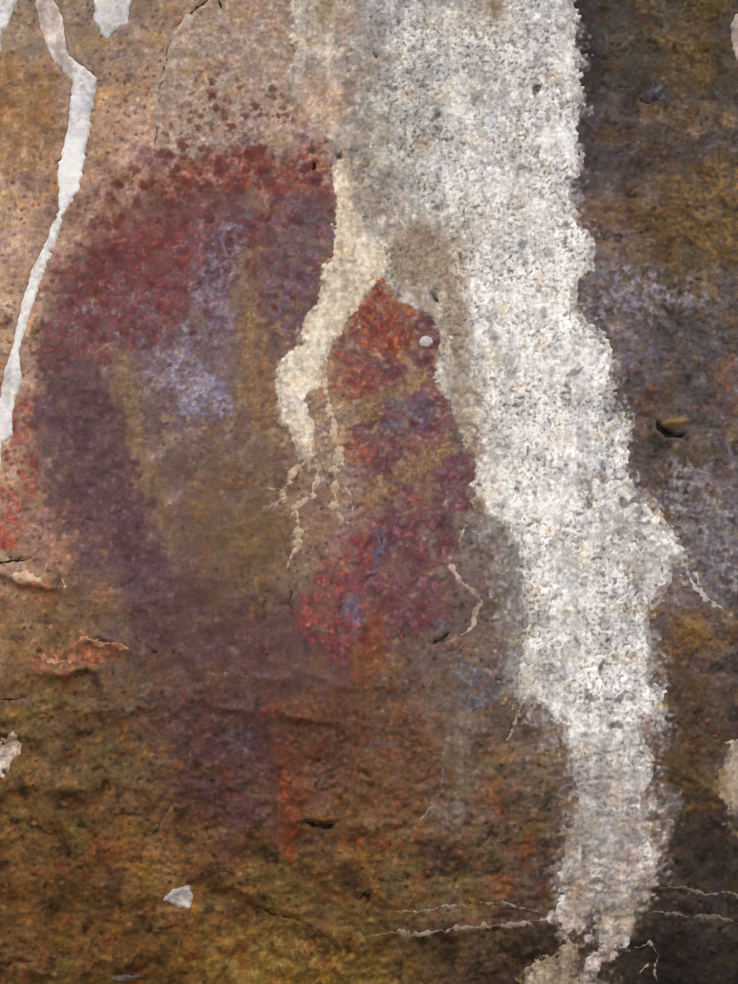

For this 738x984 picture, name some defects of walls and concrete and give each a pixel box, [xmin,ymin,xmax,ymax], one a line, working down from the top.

flaking render [0,0,18,47]
peeling [93,0,132,40]
peeling [730,14,738,61]
crack [153,0,222,152]
corrosion [336,222,483,459]
corrosion [371,443,449,502]
spalling [0,731,22,778]
peeling [712,739,738,811]
peeling [163,885,193,909]